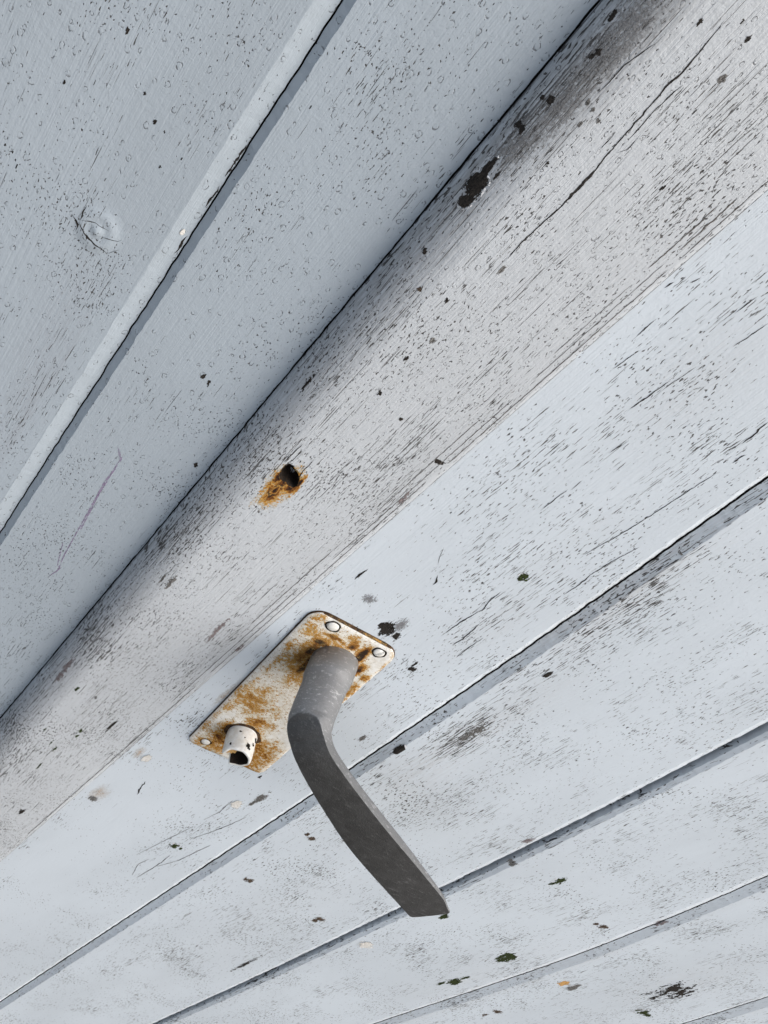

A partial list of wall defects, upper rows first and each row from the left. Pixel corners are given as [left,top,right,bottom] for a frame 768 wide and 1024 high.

crack [509,21,724,257]
peeling [457,155,501,210]
corrosion [249,464,308,509]
peeling [378,622,401,640]
corrosion [191,613,394,772]
peeling [633,980,698,1013]